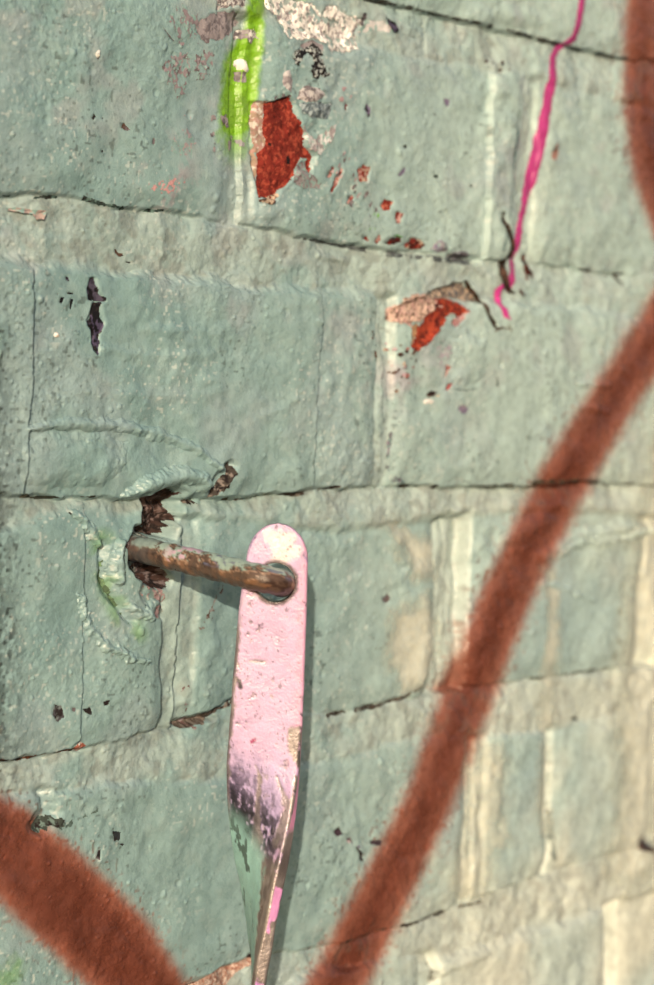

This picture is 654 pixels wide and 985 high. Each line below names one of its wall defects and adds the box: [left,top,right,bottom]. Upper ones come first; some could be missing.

peeling [162,0,259,99]
peeling [147,177,185,194]
spalling [210,0,469,260]
crack [512,111,520,170]
crack [303,195,534,332]
spalling [372,282,475,404]
peeling [188,954,251,985]